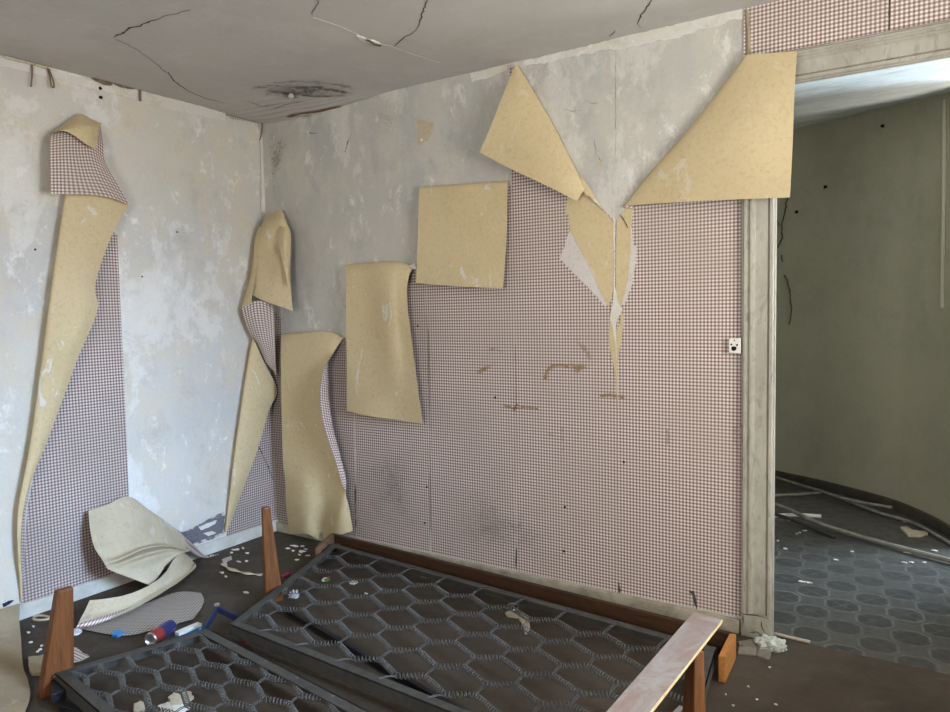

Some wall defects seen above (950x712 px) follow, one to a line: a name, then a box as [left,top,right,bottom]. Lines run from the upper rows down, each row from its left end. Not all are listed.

crack [115,10,222,103]
spalling [470,66,507,82]
crack [777,198,792,325]